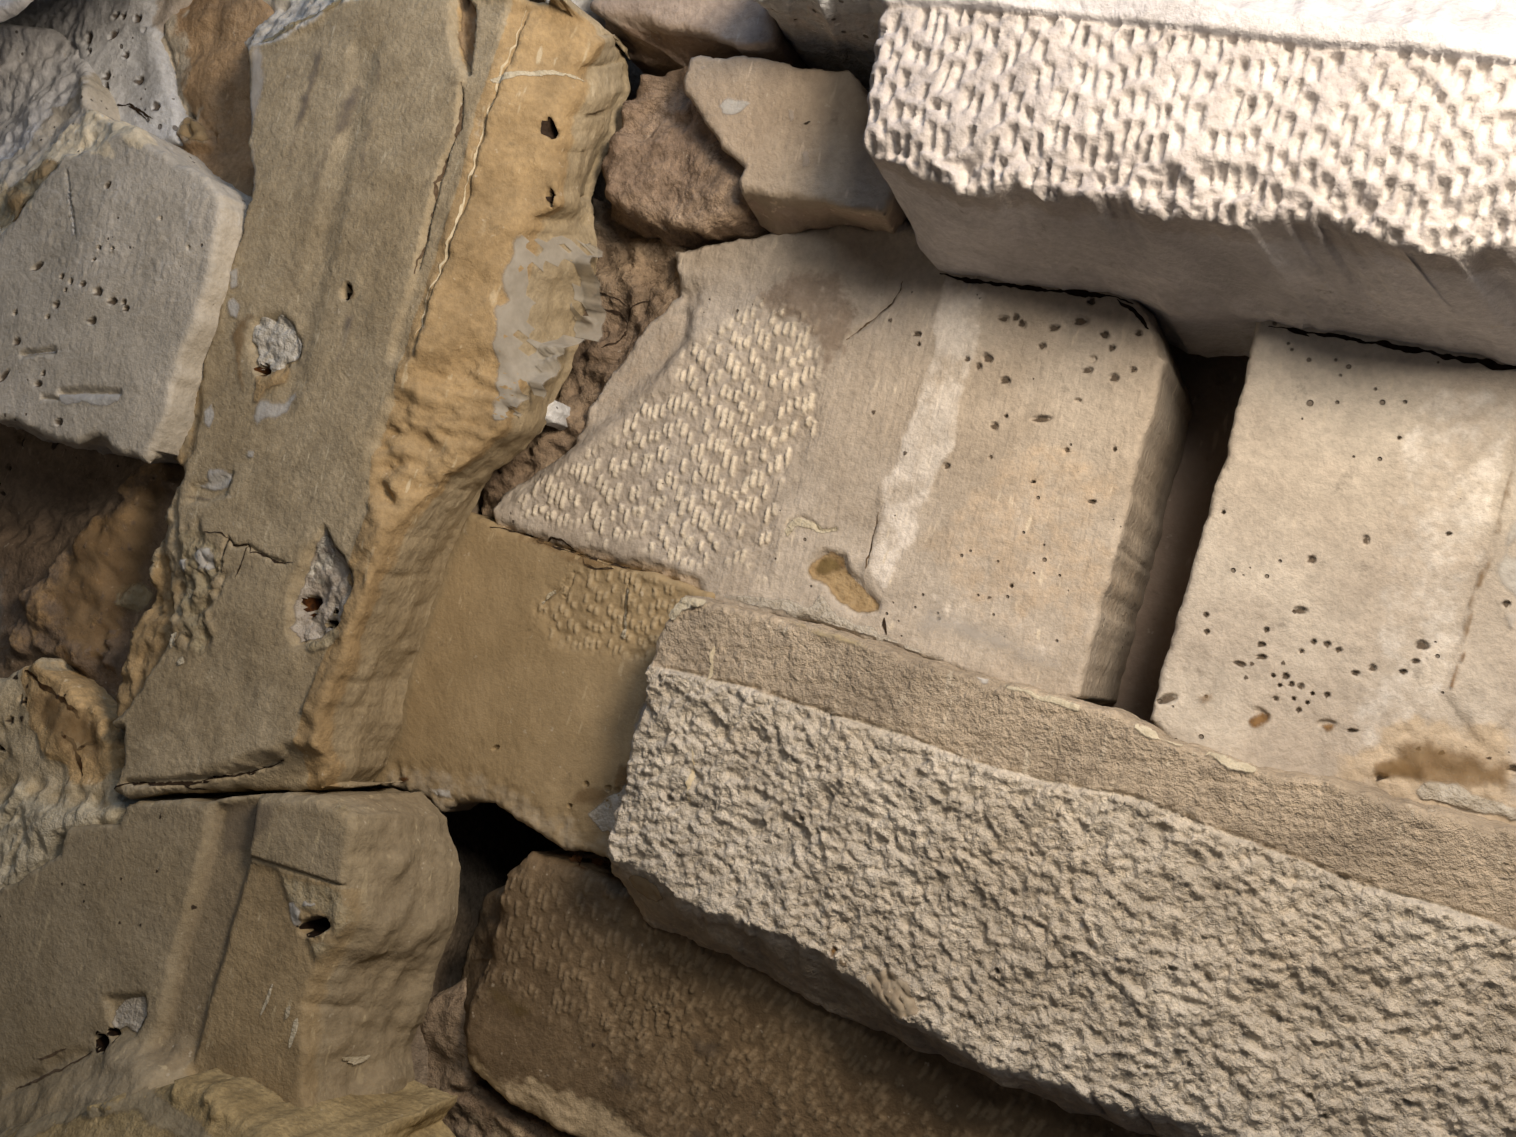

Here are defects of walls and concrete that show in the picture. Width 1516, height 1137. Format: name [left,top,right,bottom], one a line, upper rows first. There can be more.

spalling [228,269,302,422]
peeling [205,405,214,426]
crack [193,531,295,577]
spalling [290,529,354,651]
crack [25,670,284,791]
damp [1376,745,1503,784]
spalling [107,997,147,1043]